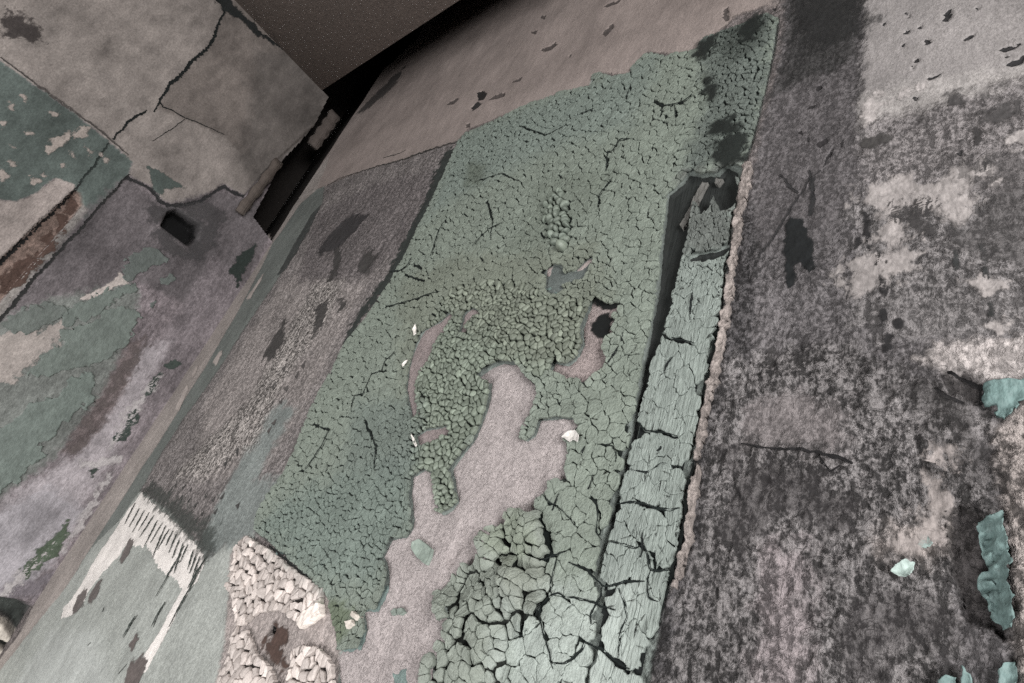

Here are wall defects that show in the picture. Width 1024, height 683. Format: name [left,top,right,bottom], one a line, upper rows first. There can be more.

crack [0,0,283,322]
damp [692,32,719,60]
damp [697,76,719,105]
damp [706,113,749,168]
damp [735,11,765,43]
rust [0,194,78,294]
crack [253,12,779,683]
peeling [982,378,1024,420]
crack [741,443,853,471]
peeling [61,492,205,683]
flaking render [217,364,579,683]
peeling [976,510,1015,630]